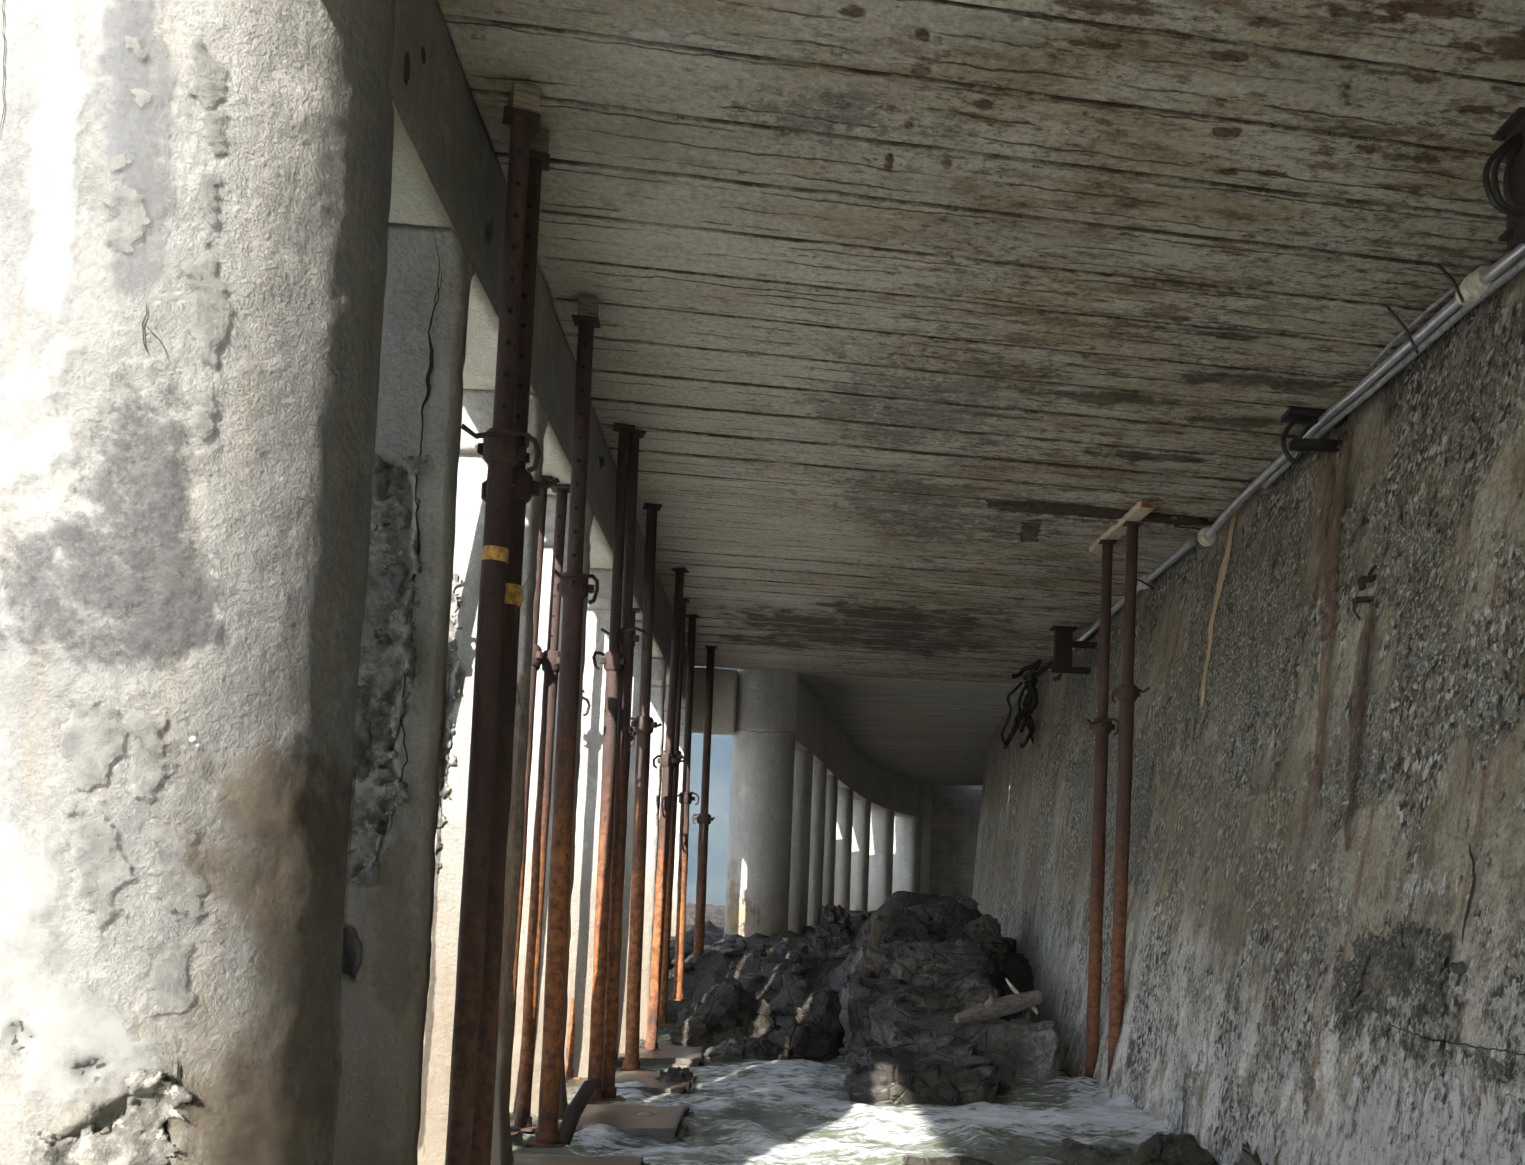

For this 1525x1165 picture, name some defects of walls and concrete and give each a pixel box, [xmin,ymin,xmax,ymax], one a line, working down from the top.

leakage [100,0,174,285]
crack [409,223,442,625]
spalling [347,453,428,884]
crack [387,676,408,835]
rust [1344,598,1373,852]
peeling [0,696,207,1165]
spalling [342,926,362,977]
leakage [1017,909,1103,1085]
leakage [1119,873,1525,1165]